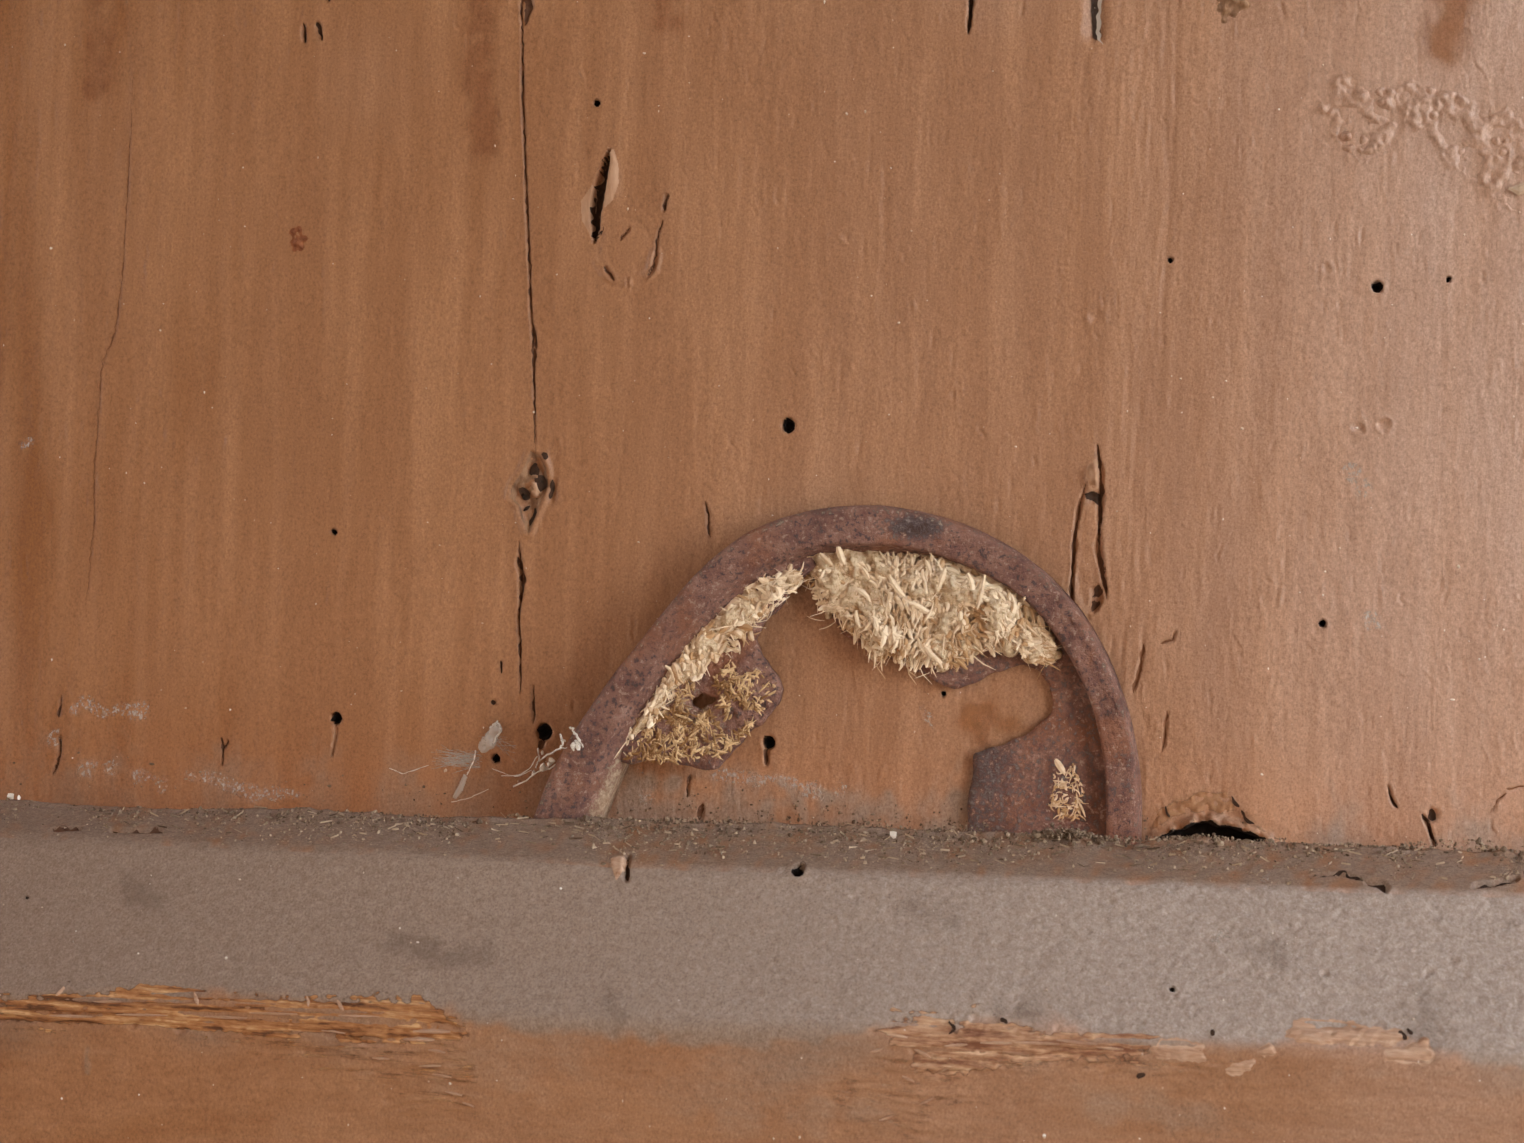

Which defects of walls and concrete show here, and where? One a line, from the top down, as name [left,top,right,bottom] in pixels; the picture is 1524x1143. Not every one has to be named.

crack [520,0,538,447]
crack [491,543,536,722]
rust [533,505,1142,845]
peeling [1152,791,1266,842]
peeling [0,981,474,1108]
peeling [870,1004,1215,1116]
peeling [1225,1017,1435,1076]